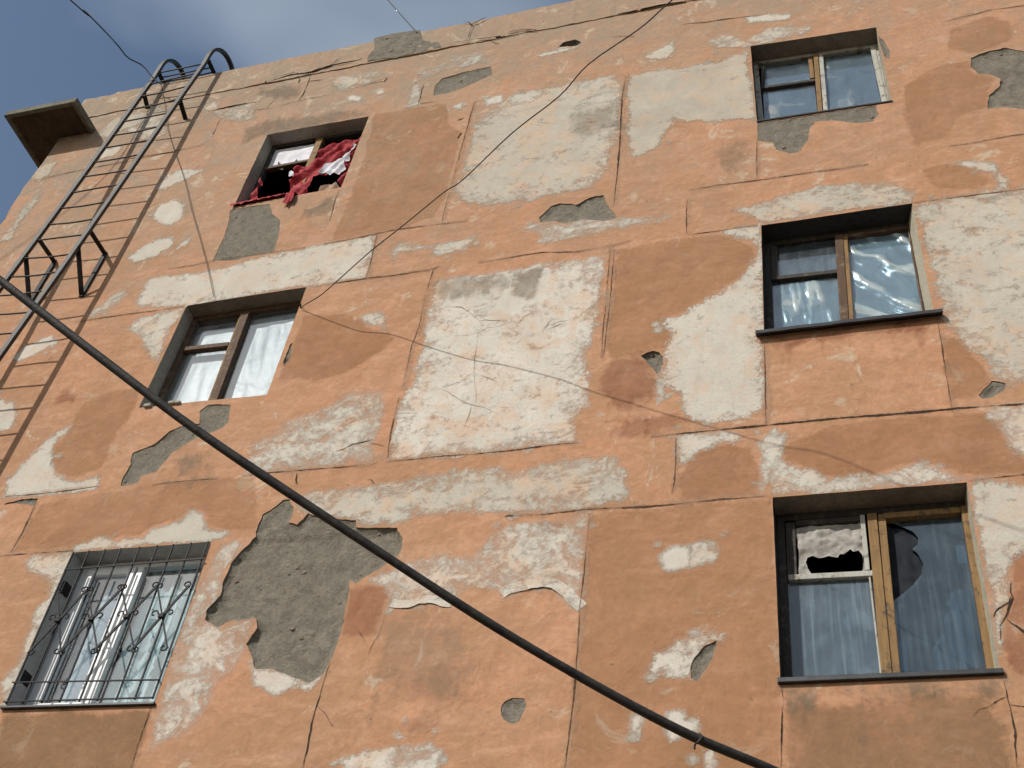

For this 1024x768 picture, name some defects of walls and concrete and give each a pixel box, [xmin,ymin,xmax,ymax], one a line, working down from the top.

flaking render [332,30,441,102]
flaking render [406,52,494,108]
peeling [452,13,879,243]
flaking render [971,48,1024,109]
peeling [89,204,381,363]
crack [177,105,578,484]
peeling [641,160,1024,463]
peeling [0,255,629,748]
crack [538,319,1024,765]
crack [302,663,333,768]
peeling [645,629,725,682]